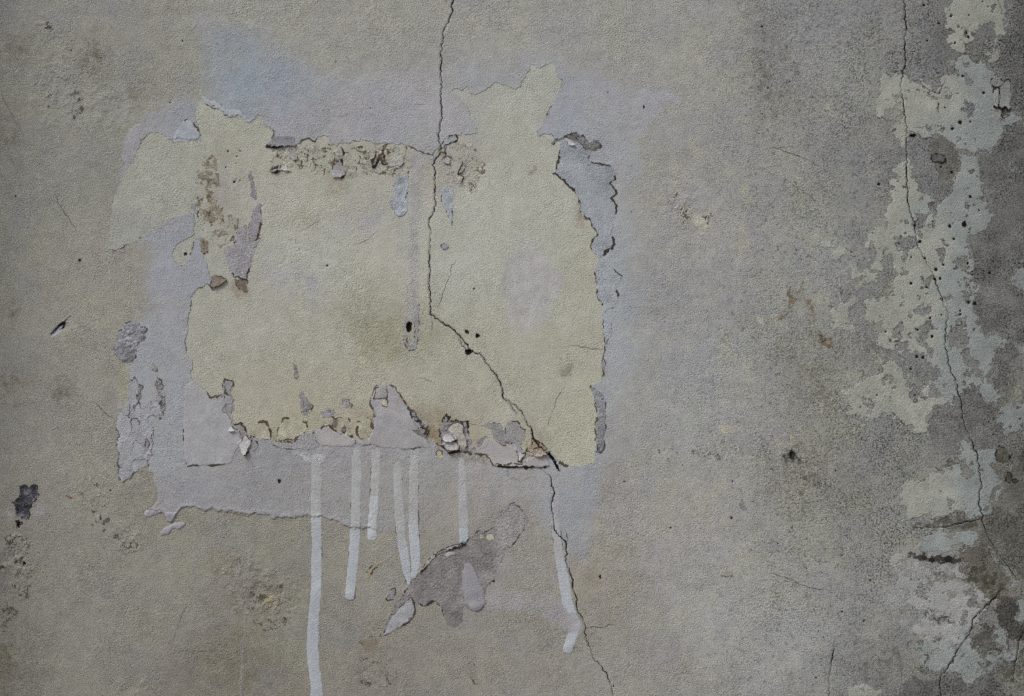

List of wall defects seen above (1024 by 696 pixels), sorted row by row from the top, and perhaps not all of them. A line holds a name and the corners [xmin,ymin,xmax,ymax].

peeling [81,376,165,554]
peeling [105,63,623,467]
peeling [379,502,529,637]
crack [418,0,613,695]
peeling [804,0,1024,696]
crack [884,3,1018,695]